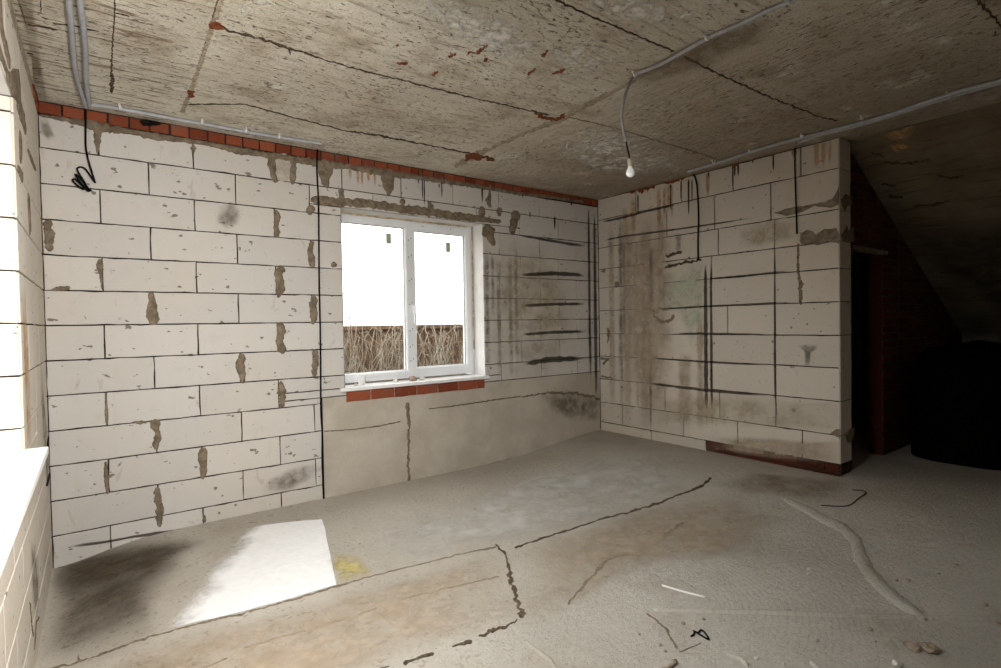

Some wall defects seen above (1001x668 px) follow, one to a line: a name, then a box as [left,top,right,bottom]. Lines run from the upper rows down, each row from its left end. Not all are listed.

crack [977,0,1001,35]
damp [670,180,693,214]
crack [325,212,620,481]
crack [51,477,712,668]
crack [29,602,40,650]